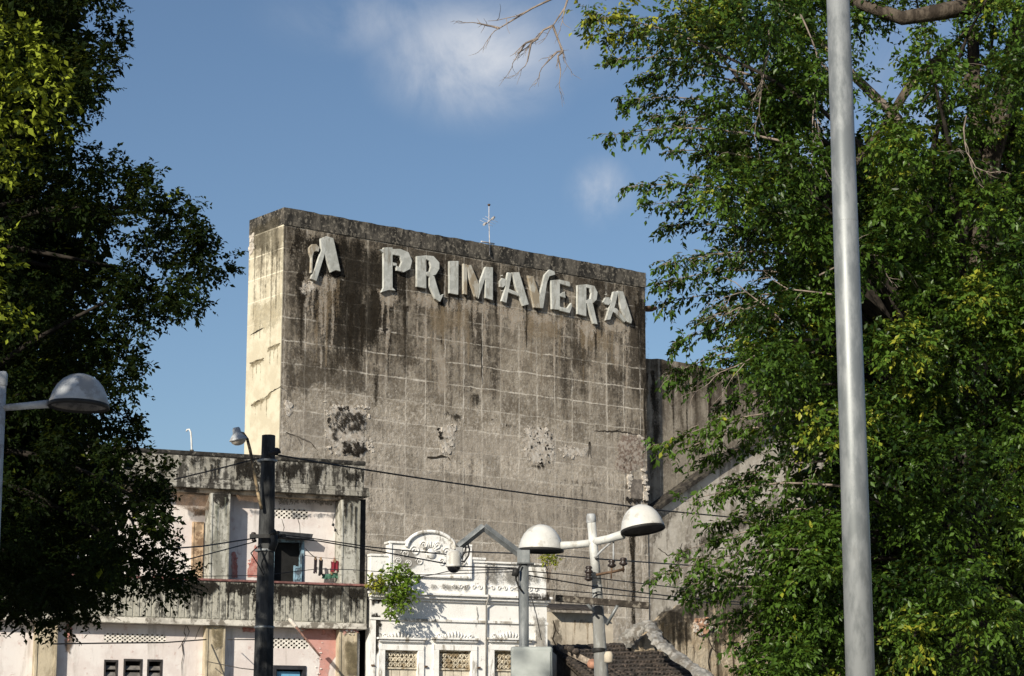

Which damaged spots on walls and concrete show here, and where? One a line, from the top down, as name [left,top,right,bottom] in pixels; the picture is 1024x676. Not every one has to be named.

leakage [289,227,759,474]
peeling [323,401,374,458]
peeling [437,424,456,454]
peeling [522,425,592,467]
leakage [275,462,327,486]
leakage [278,468,365,552]
leakage [173,582,256,616]